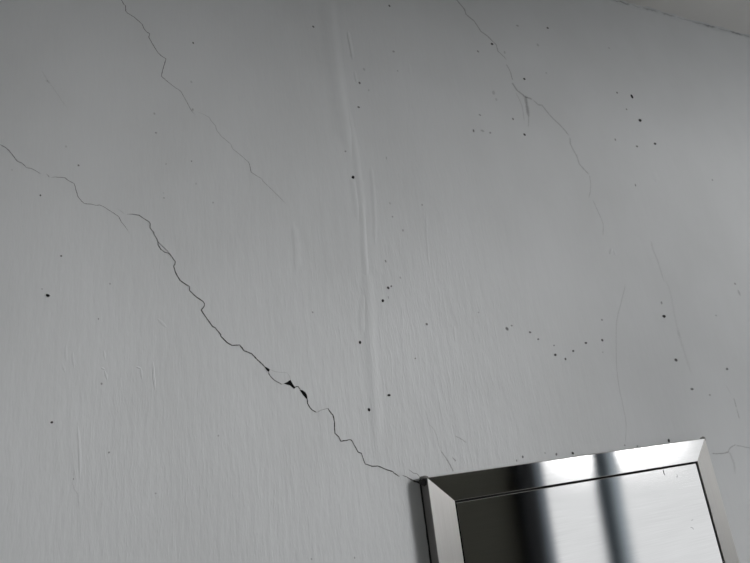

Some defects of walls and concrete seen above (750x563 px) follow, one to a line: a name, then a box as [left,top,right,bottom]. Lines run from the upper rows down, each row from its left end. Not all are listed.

crack [121,0,192,111]
crack [58,177,419,484]